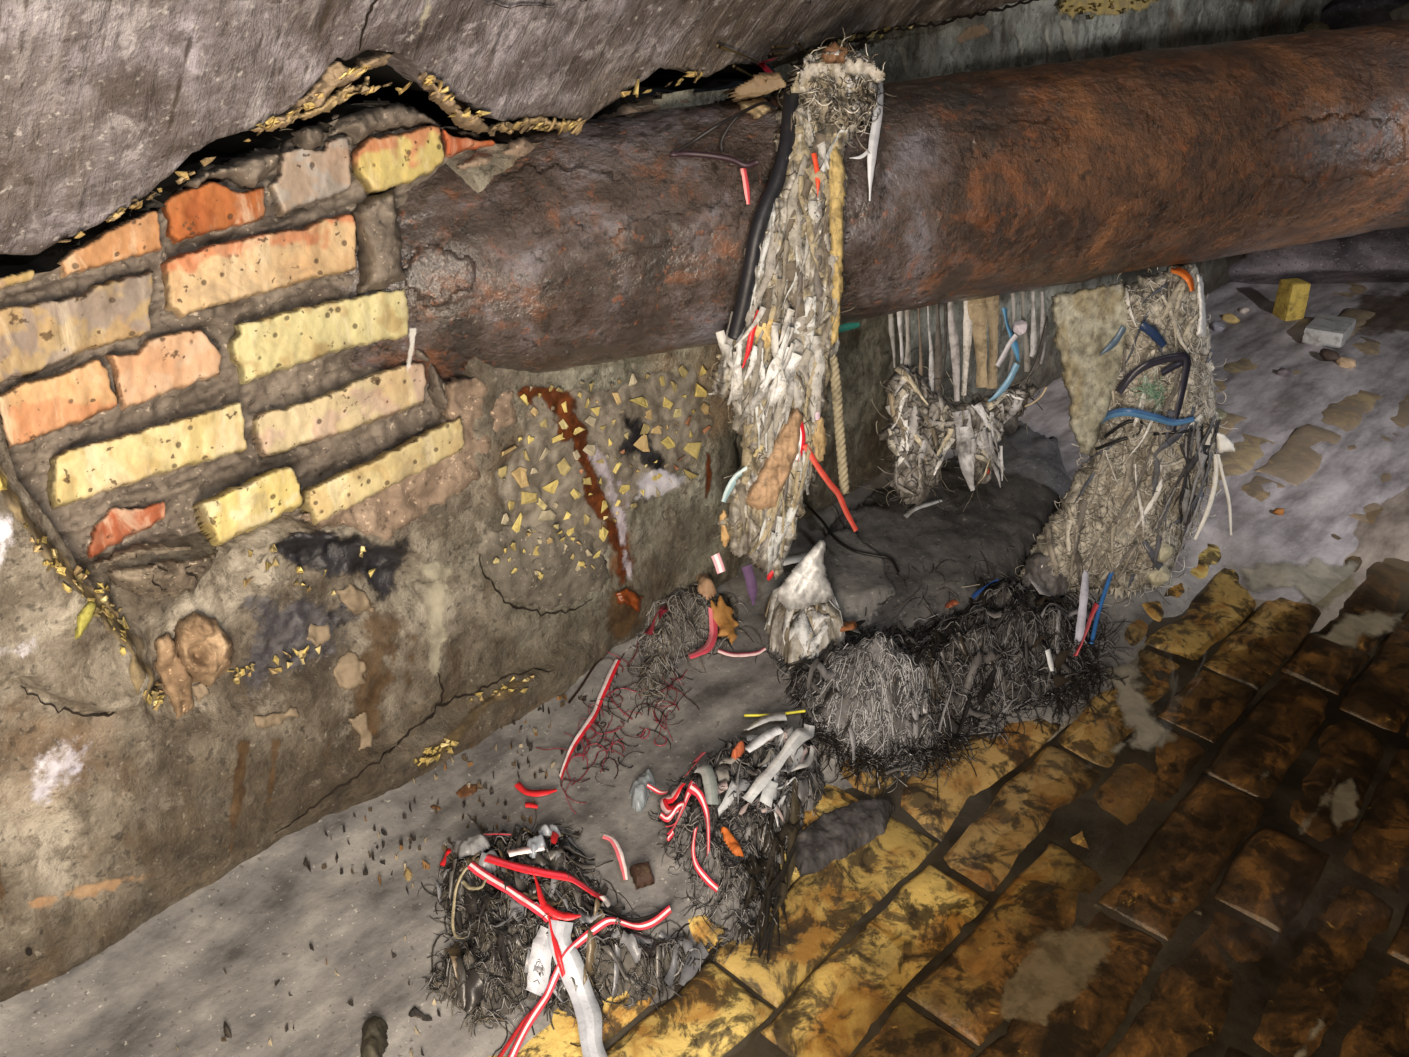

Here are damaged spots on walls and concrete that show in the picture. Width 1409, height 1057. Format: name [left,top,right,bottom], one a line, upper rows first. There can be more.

spalling [244,52,587,142]
spalling [620,70,703,98]
crack [0,0,766,277]
spalling [105,156,217,223]
water stain [0,520,11,561]
spalling [0,466,165,711]
spalling [243,543,279,588]
corrosion [518,387,644,638]
spalling [227,623,331,684]
water stain [243,562,451,736]
crack [20,686,115,717]